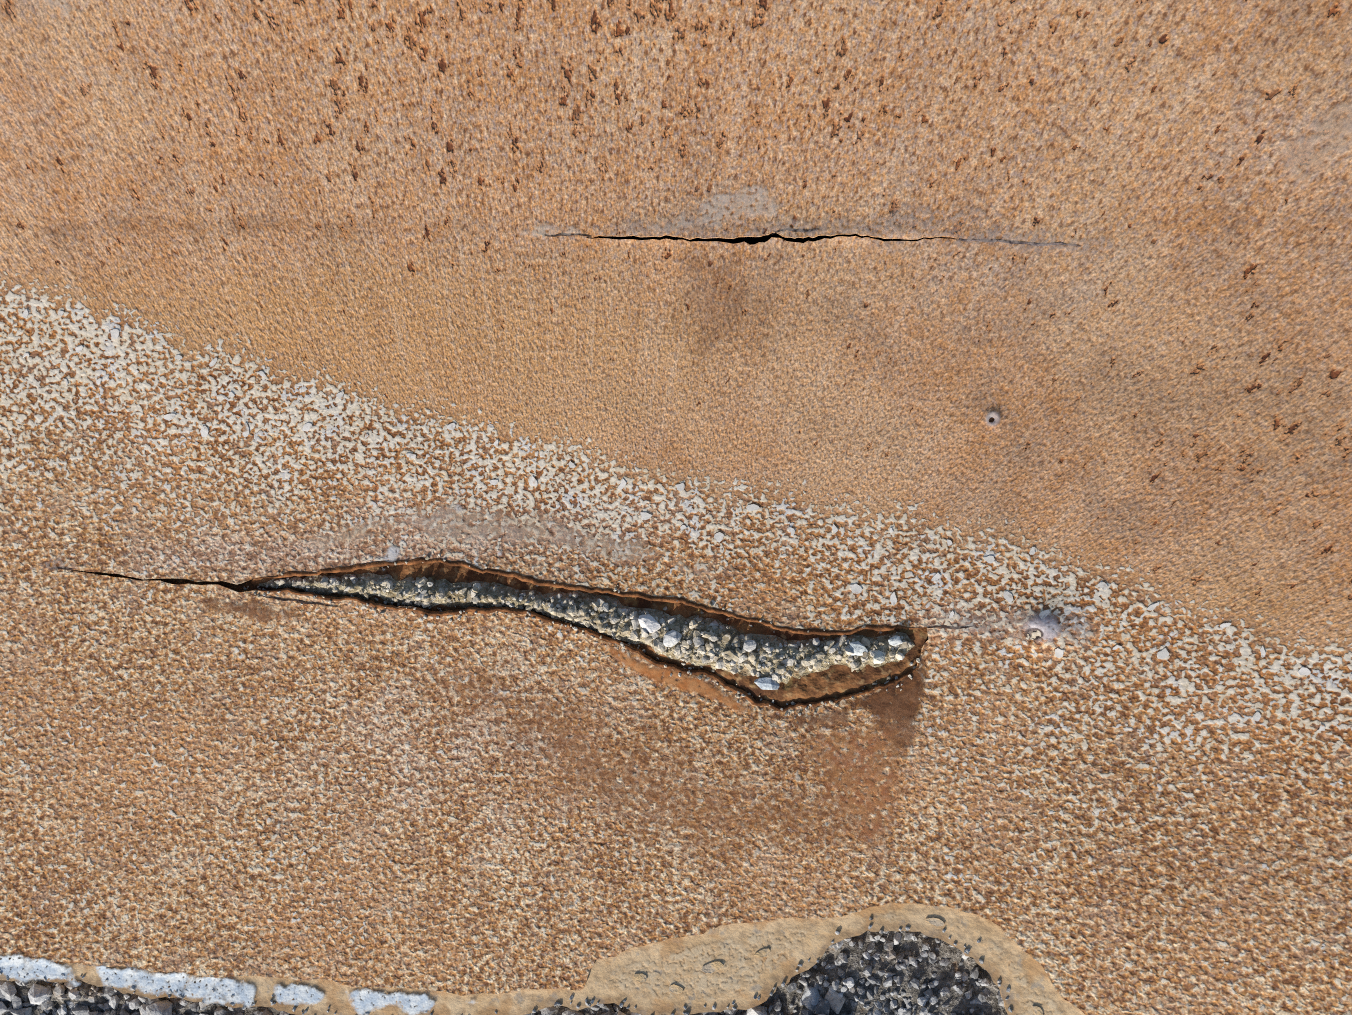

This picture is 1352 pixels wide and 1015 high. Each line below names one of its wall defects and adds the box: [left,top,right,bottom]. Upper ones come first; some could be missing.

crack [538,229,1084,248]
peeling [0,267,1352,1015]